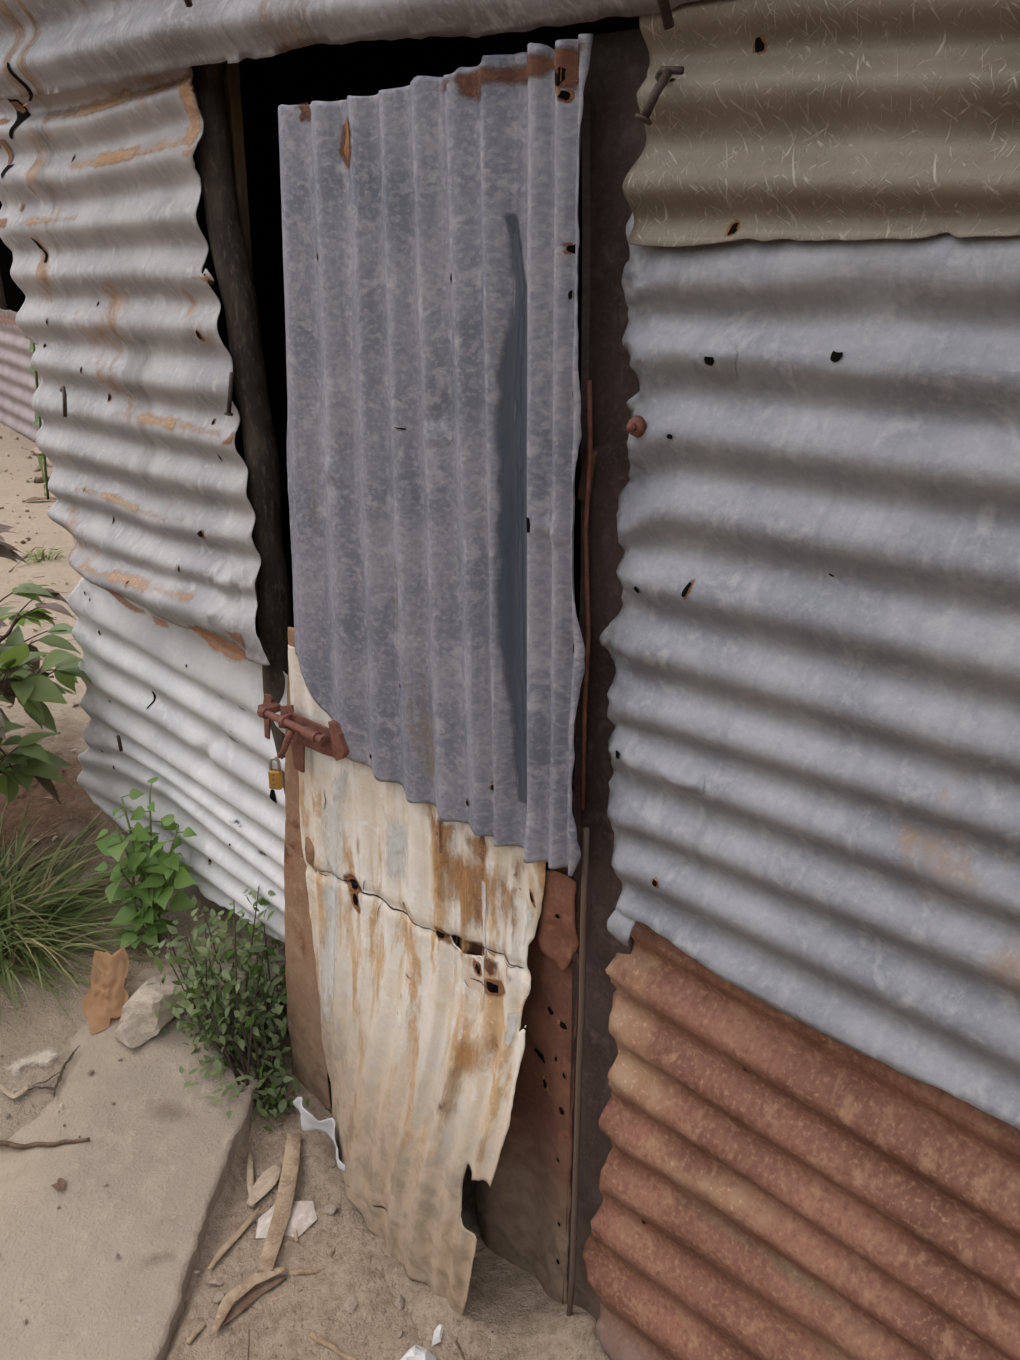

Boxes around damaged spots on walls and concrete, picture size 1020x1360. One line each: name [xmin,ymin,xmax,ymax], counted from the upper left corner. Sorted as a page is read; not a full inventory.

corrosion [442,42,580,103]
corrosion [45,70,200,168]
corrosion [137,413,216,431]
corrosion [343,874,361,913]
corrosion [432,817,519,997]
corrosion [439,1046,478,1112]